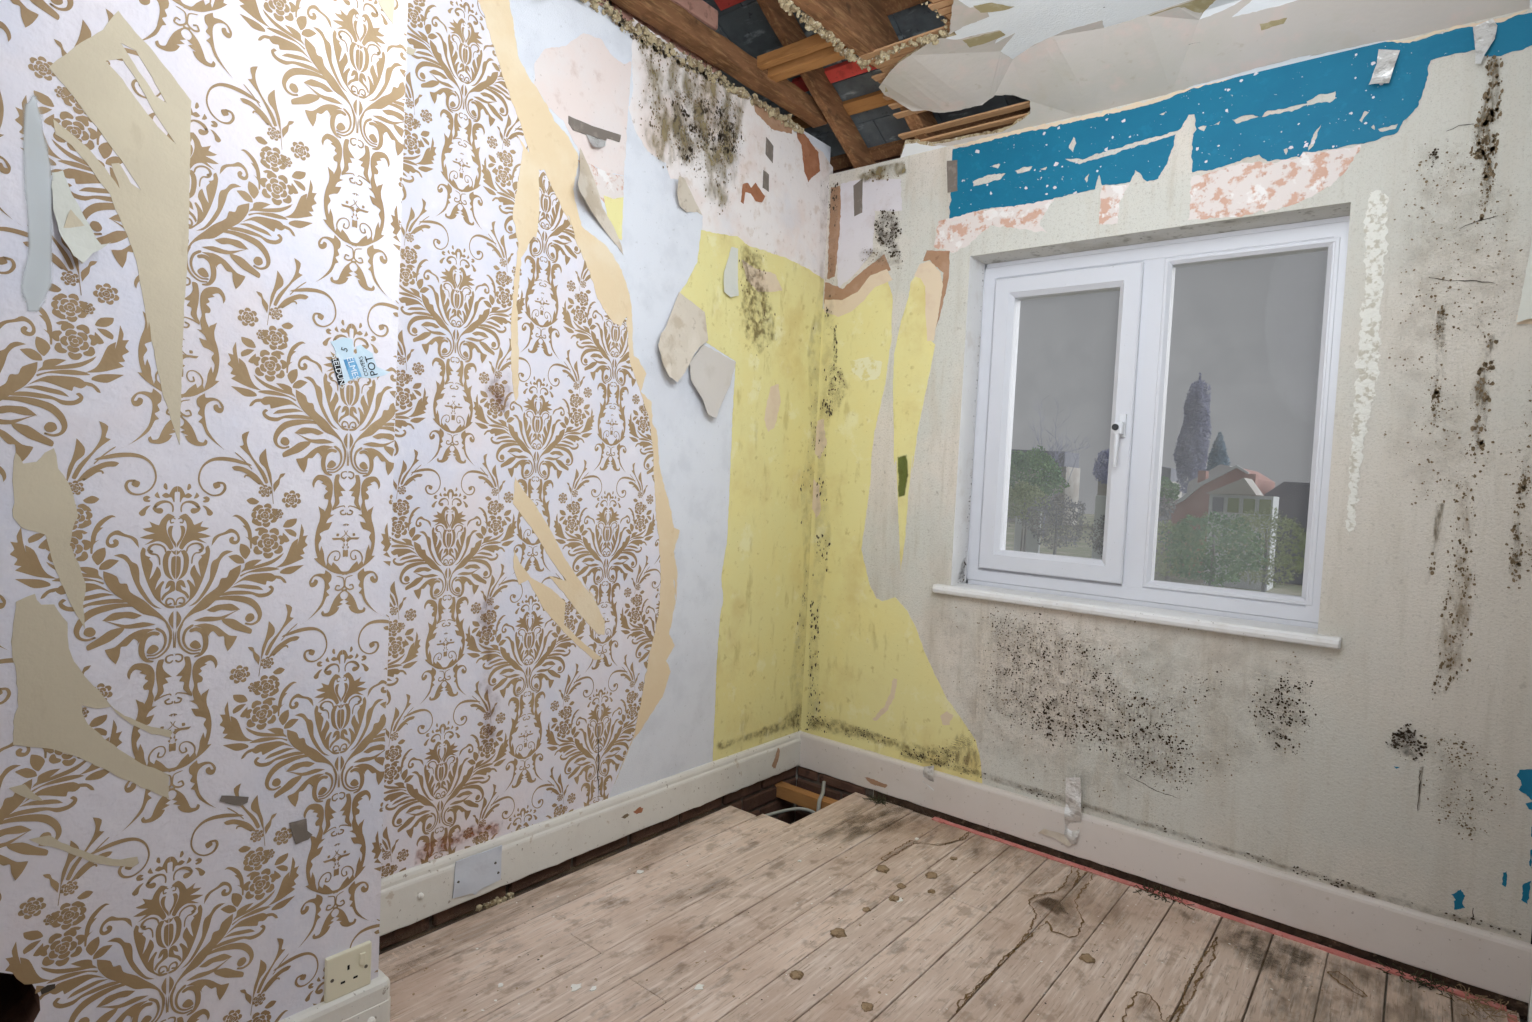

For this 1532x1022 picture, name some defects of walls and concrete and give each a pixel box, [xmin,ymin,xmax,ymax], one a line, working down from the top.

damp [612,9,744,215]
flaking render [534,18,902,317]
flaking render [879,0,1530,341]
damp [808,258,845,456]
damp [1388,55,1532,700]
damp [766,535,986,779]
damp [953,607,1317,814]
damp [1385,724,1507,840]
spalling [0,972,40,1022]